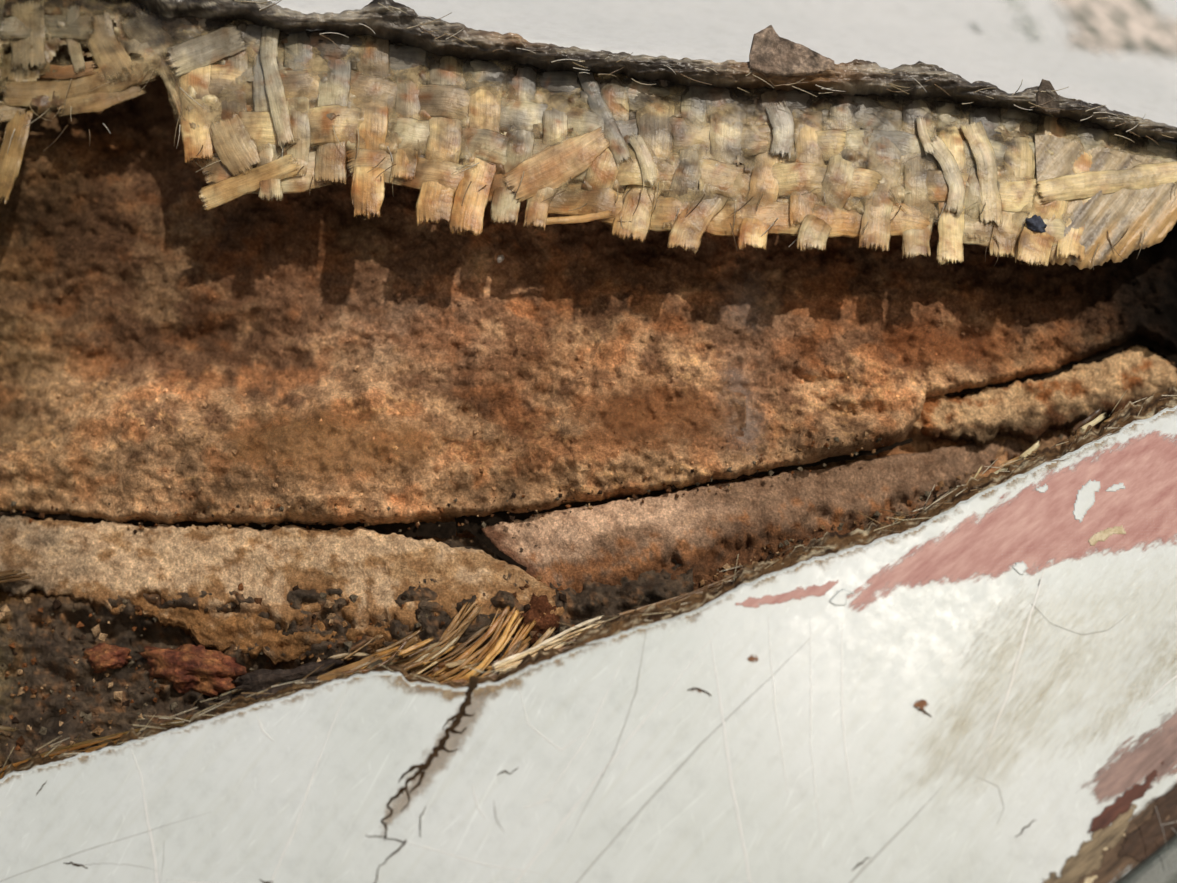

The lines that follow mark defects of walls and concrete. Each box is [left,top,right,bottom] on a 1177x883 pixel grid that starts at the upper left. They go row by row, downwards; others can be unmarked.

peeling [749,25,835,77]
peeling [1061,0,1177,56]
peeling [1035,79,1060,115]
crack [934,335,1177,398]
crack [0,438,913,571]
peeling [735,431,1177,611]
crack [365,676,479,883]
peeling [1089,713,1177,803]